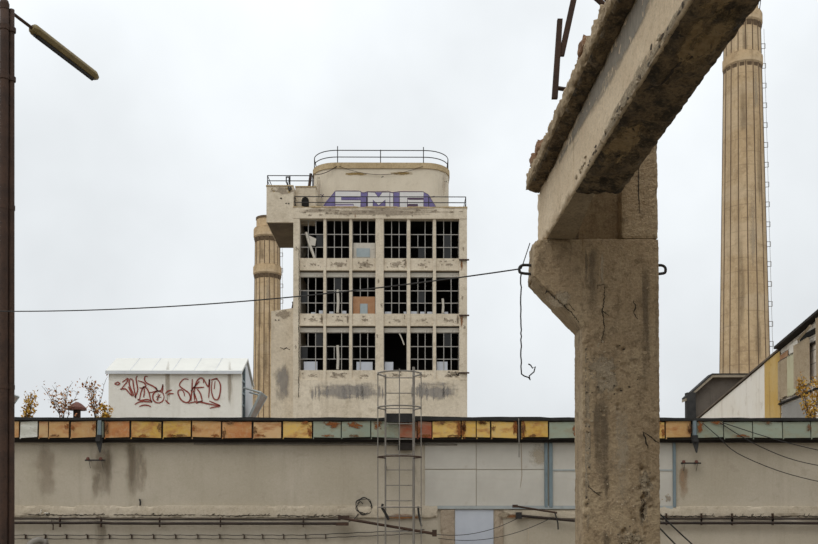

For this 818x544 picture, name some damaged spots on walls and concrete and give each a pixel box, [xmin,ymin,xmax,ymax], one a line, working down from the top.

spalling [575,0,686,179]
crack [545,290,579,322]
crack [597,284,609,343]
damp [311,385,383,398]
damp [411,383,451,399]